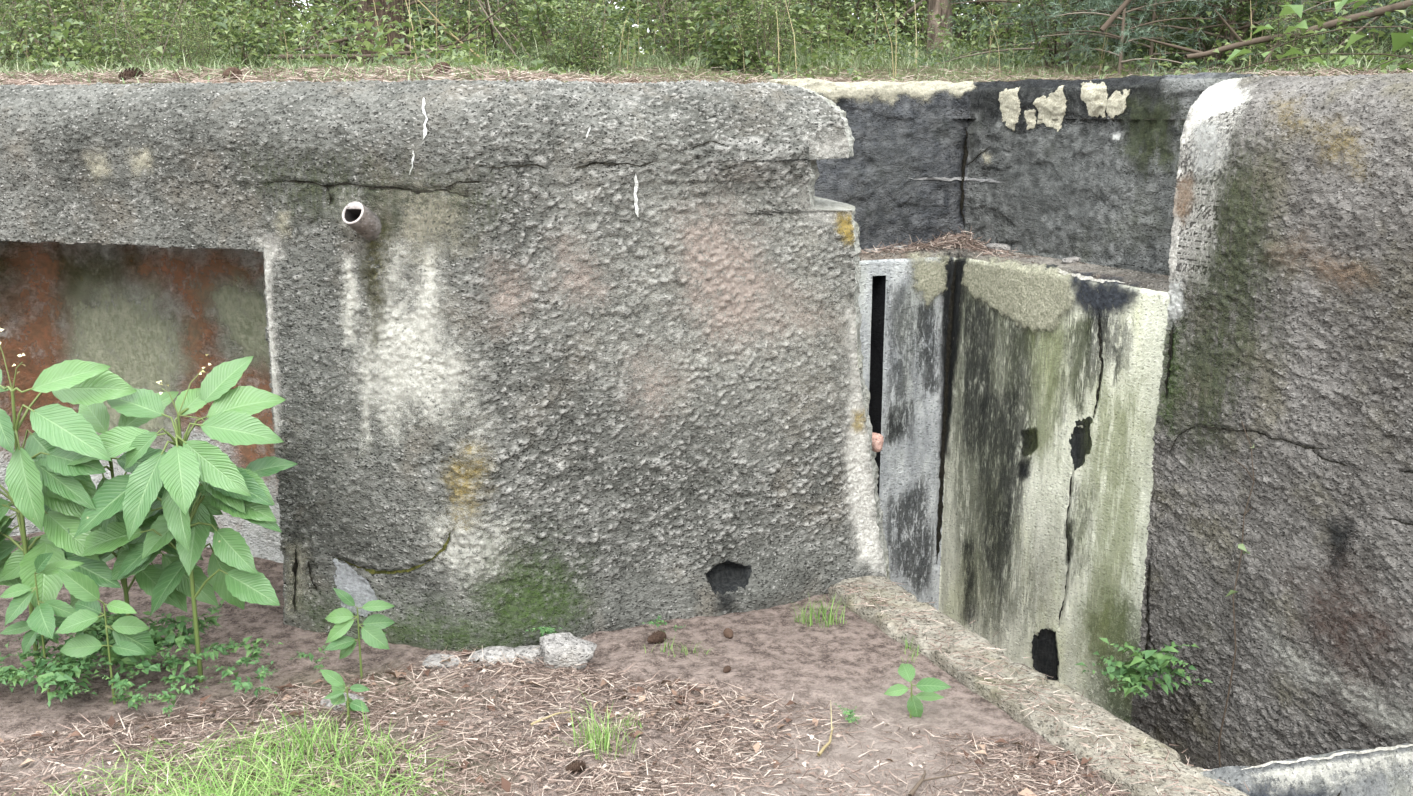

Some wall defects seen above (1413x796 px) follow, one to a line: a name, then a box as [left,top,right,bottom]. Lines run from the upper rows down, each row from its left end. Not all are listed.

crack [269,161,657,204]
crack [691,140,729,148]
corrosion [0,244,78,436]
corrosion [125,250,264,428]
corrosion [229,363,275,469]
damp [345,194,462,437]
spalling [688,228,763,324]
damp [889,481,933,593]
peeling [764,78,1130,579]
damp [964,300,1015,622]
peeling [1031,315,1103,681]
damp [1069,307,1121,411]